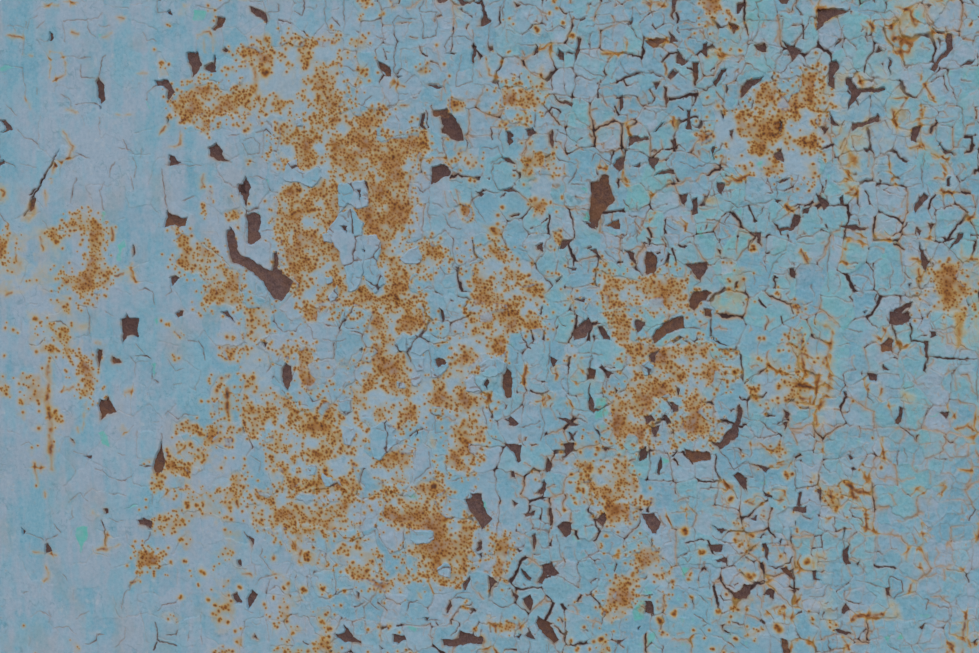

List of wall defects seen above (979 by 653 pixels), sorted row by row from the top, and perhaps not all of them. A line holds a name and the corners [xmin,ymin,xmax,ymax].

peeling [433,109,464,141]
peeling [582,150,659,229]
crack [533,0,731,186]
corrosion [665,0,979,228]
corrosion [0,127,142,500]
peeling [227,213,293,301]
corrosion [91,0,858,653]
crack [481,326,615,450]
peeling [686,262,712,317]
crack [706,375,822,505]
crack [866,107,979,463]
corrosion [904,223,979,354]